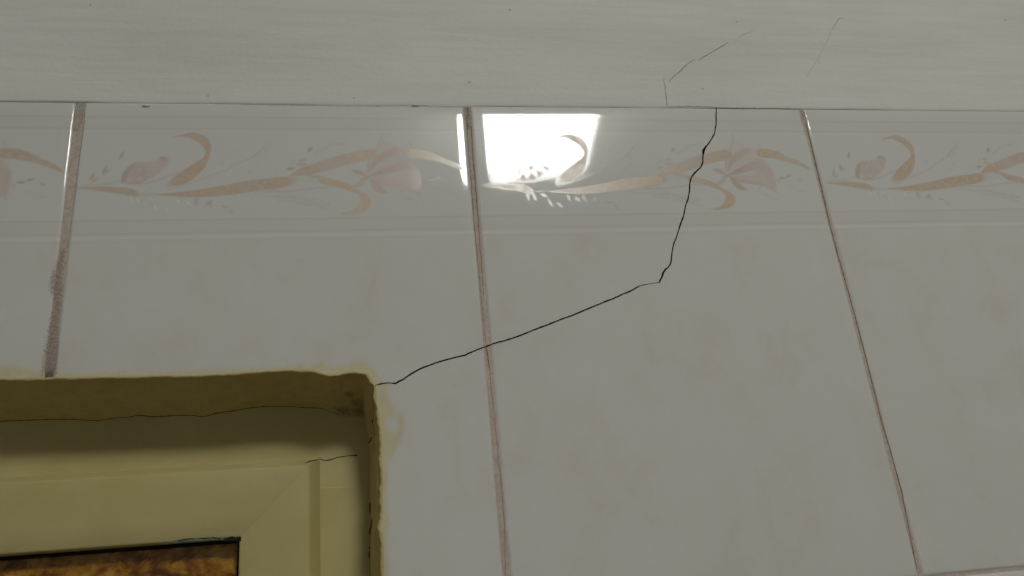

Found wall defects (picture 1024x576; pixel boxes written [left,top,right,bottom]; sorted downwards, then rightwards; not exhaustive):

crack [663,30,754,105]
crack [306,108,717,536]
crack [0,406,338,422]
crack [366,502,374,558]